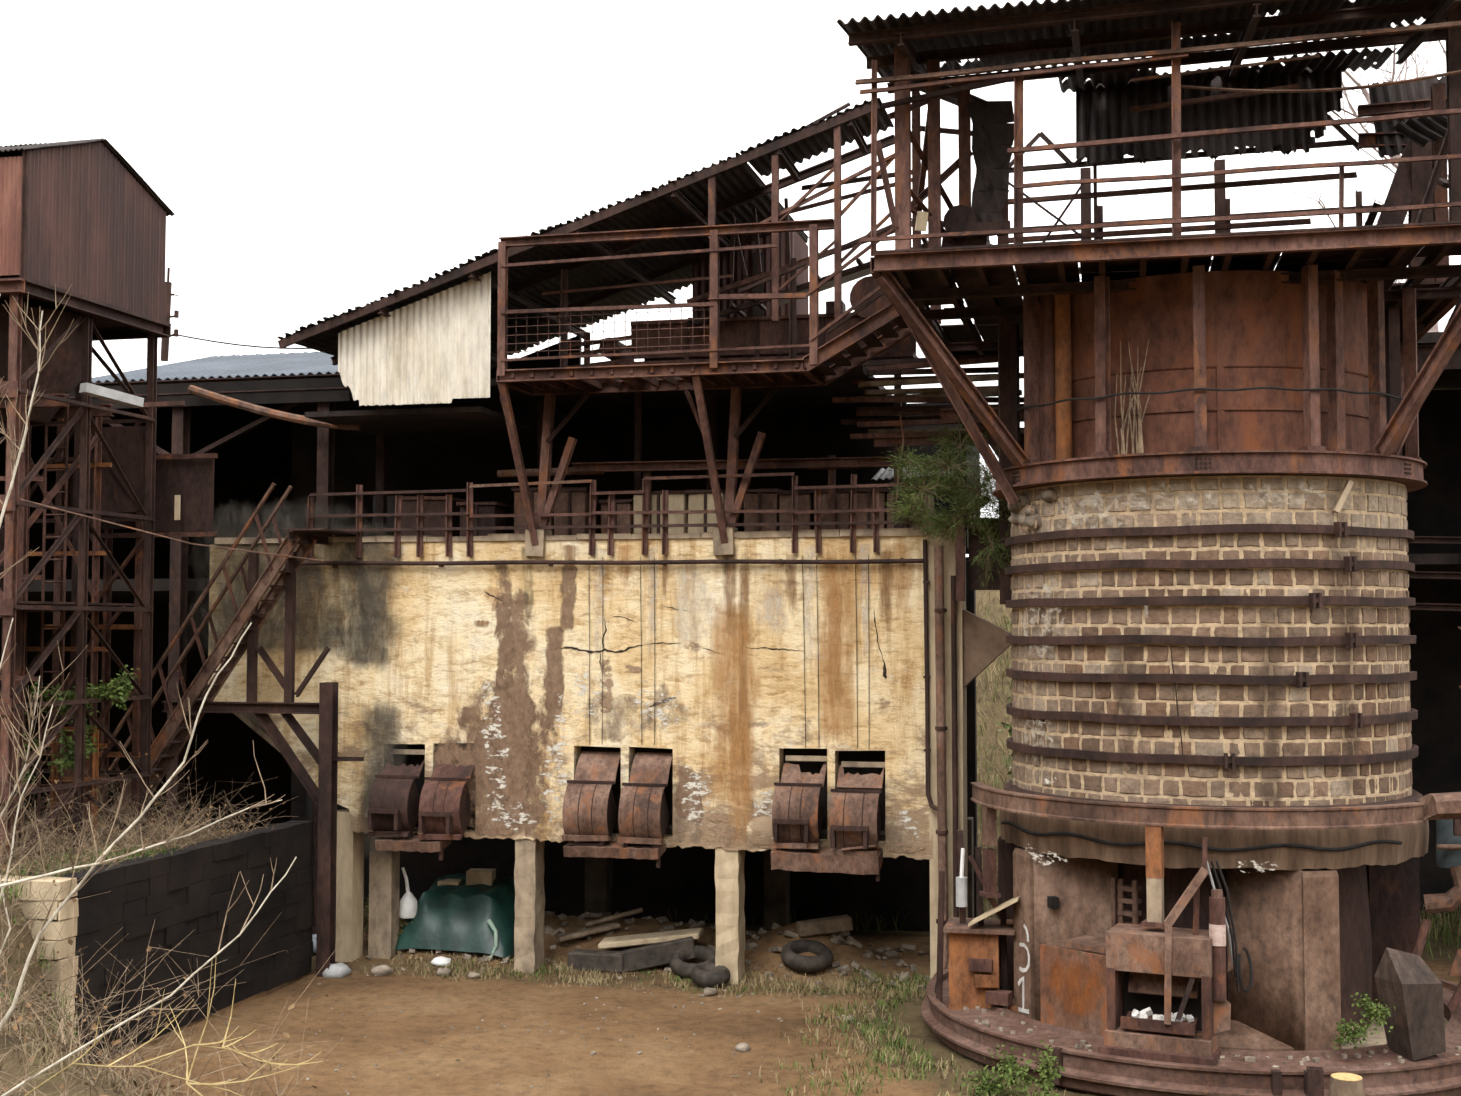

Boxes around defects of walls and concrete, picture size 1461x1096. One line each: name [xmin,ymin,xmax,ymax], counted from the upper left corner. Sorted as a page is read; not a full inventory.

damp [434,565,577,839]
damp [590,685,682,741]
crack [543,605,801,666]
rust [715,547,753,837]
rust [823,559,851,729]
damp [674,765,702,842]